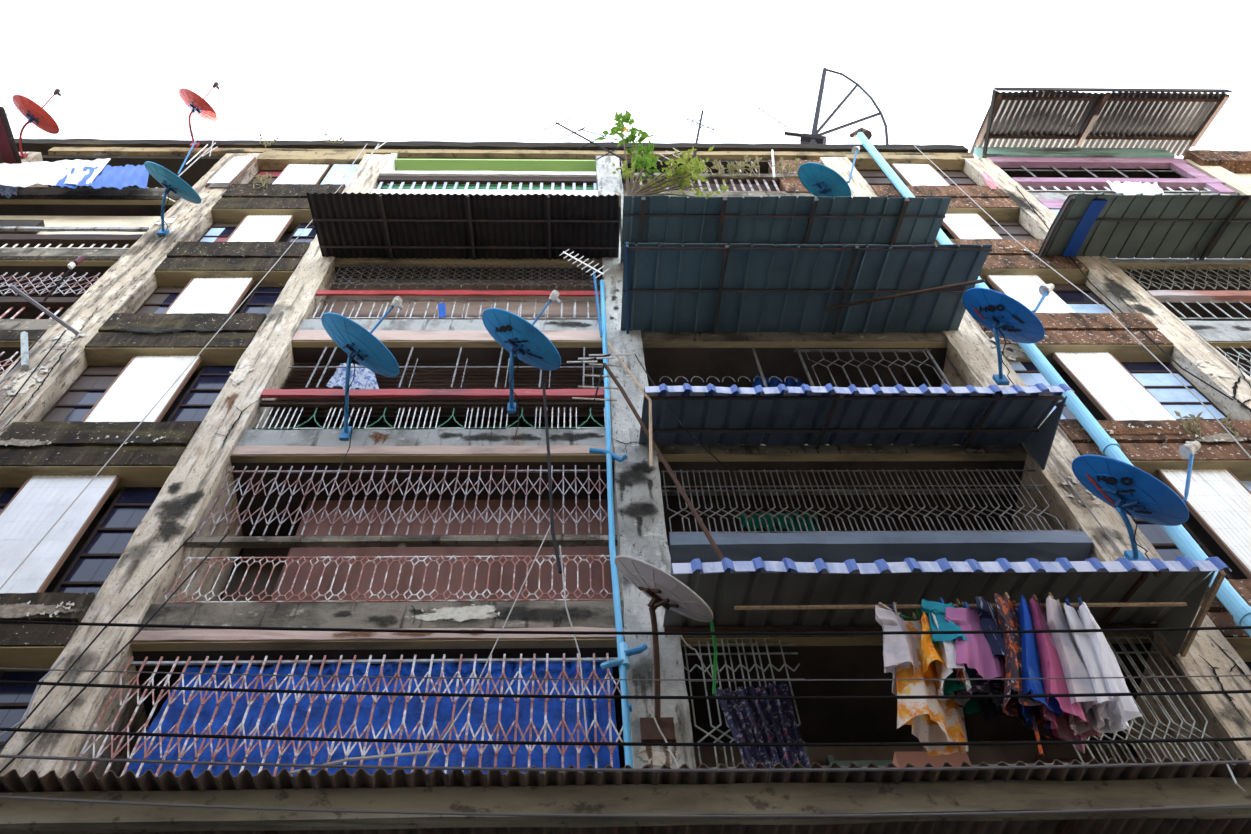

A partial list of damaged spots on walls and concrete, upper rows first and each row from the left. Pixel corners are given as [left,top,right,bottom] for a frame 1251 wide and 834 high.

water stain [153,482,204,541]
water stain [615,461,657,536]